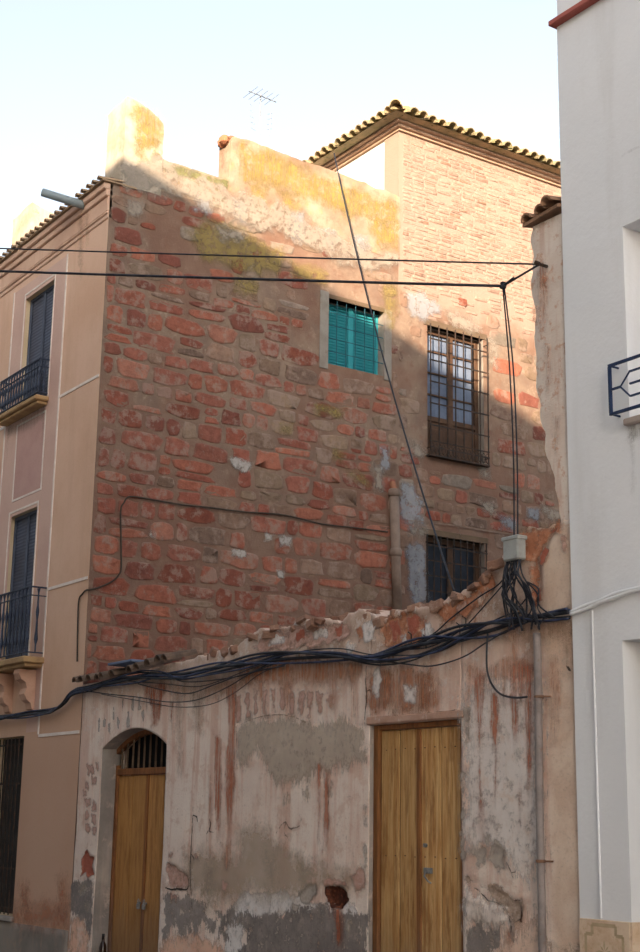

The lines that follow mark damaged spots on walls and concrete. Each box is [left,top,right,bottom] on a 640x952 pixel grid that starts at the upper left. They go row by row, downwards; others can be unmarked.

spalling [253,574,495,659]
peeling [457,674,546,888]
peeling [68,917,90,952]
peeling [159,845,367,952]
peeling [466,875,551,952]